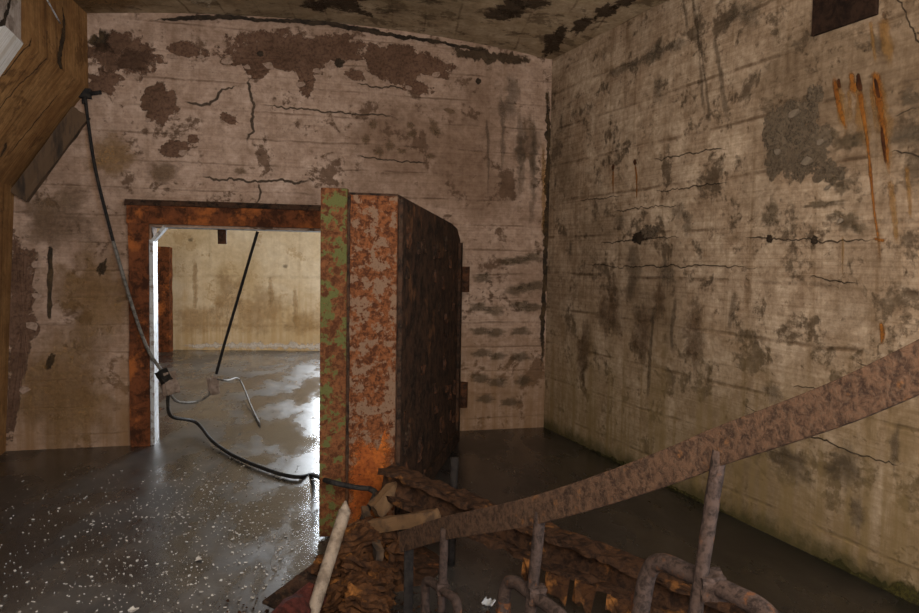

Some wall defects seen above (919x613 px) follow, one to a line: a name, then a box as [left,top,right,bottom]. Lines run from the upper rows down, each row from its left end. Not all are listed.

crack [0,0,11,27]
spalling [299,0,373,17]
spalling [484,0,551,21]
crack [897,0,919,43]
flaking render [87,27,457,127]
crack [187,80,389,140]
flaking render [153,134,199,181]
corrosion [833,73,889,243]
crack [206,169,308,202]
crack [747,236,865,244]
water stain [20,192,127,443]
crack [810,437,894,465]